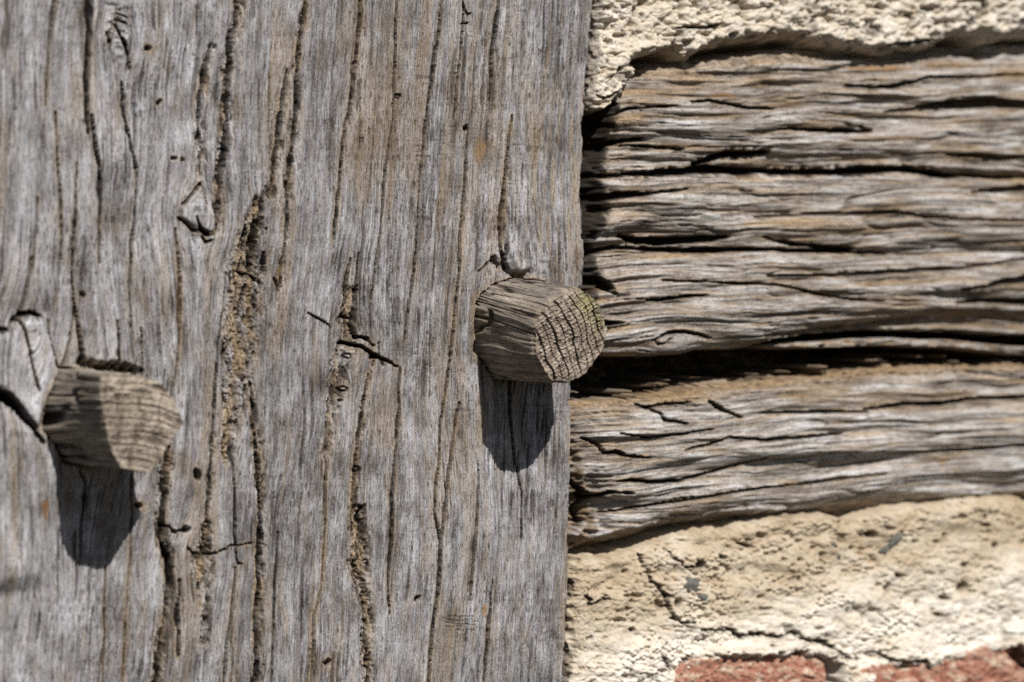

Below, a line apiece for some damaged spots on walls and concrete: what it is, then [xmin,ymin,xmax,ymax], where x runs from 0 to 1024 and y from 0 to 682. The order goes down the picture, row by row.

crack [307,0,514,682]
crack [568,72,1024,524]
peeling [685,648,851,682]
crack [636,547,942,671]
peeling [871,639,1024,682]